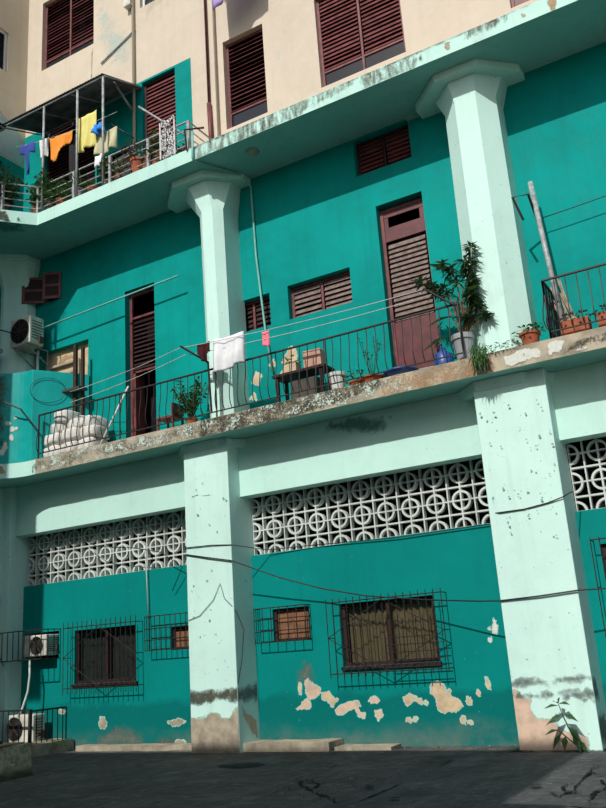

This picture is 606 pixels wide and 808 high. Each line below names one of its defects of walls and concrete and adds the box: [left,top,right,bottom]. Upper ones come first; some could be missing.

water stain [362,56,422,85]
water stain [209,99,307,150]
peeling [504,340,564,366]
water stain [104,379,384,454]
flaking render [167,706,258,753]
water stain [190,684,258,705]
peeling [296,678,384,722]
peeling [402,676,491,726]
water stain [511,678,541,698]
flaking render [512,689,590,751]
water stain [557,676,598,701]
crack [551,765,606,808]